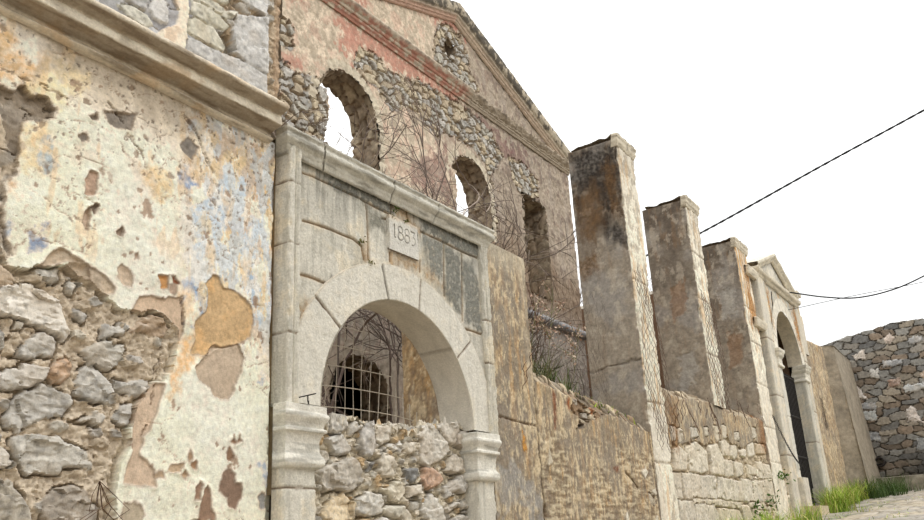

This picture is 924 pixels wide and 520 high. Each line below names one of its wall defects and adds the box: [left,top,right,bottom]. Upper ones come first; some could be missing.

spalling [217,31,238,55]
flaking render [0,85,56,211]
flaking render [89,110,136,131]
flaking render [180,137,200,160]
flaking render [82,170,99,230]
flaking render [191,274,254,400]
flaking render [0,237,198,520]
flaking render [570,399,600,429]
flaking render [195,436,243,520]
flaking render [257,493,266,510]